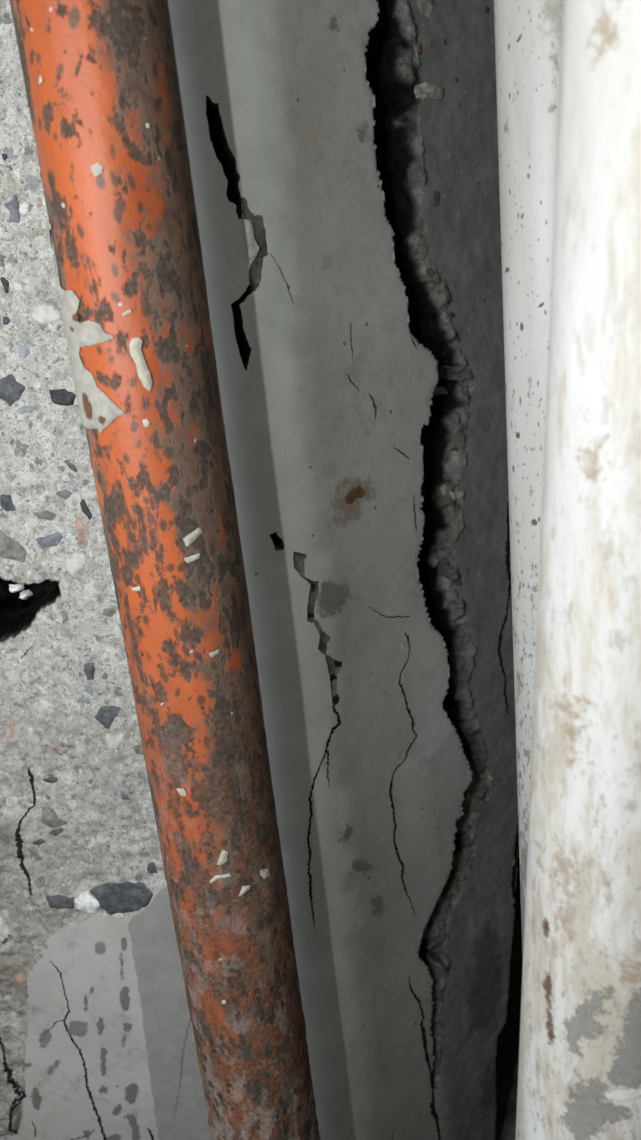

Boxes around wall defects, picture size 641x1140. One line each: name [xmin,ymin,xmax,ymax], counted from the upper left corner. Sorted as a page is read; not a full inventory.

crack [206,95,294,371]
rust [82,392,105,424]
spalling [0,0,167,1140]
rust [335,481,369,520]
crack [365,0,511,1140]
crack [14,768,36,896]
crack [0,1037,36,1137]
crack [47,961,107,1140]